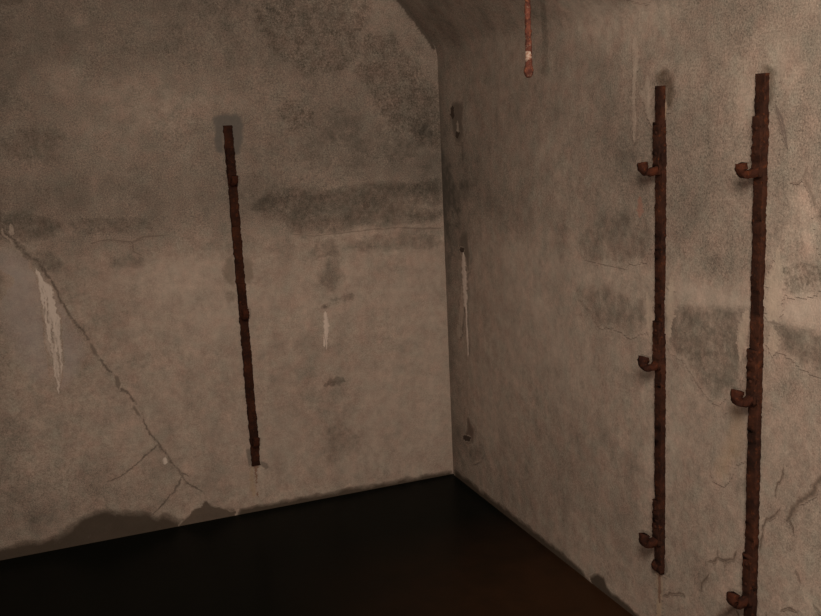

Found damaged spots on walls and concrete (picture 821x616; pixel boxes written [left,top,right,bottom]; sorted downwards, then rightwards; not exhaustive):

leakage [0,206,153,394]
leakage [456,252,469,355]
crack [0,198,203,517]
leakage [0,506,188,560]
crack [664,550,737,598]
crack [759,467,821,550]